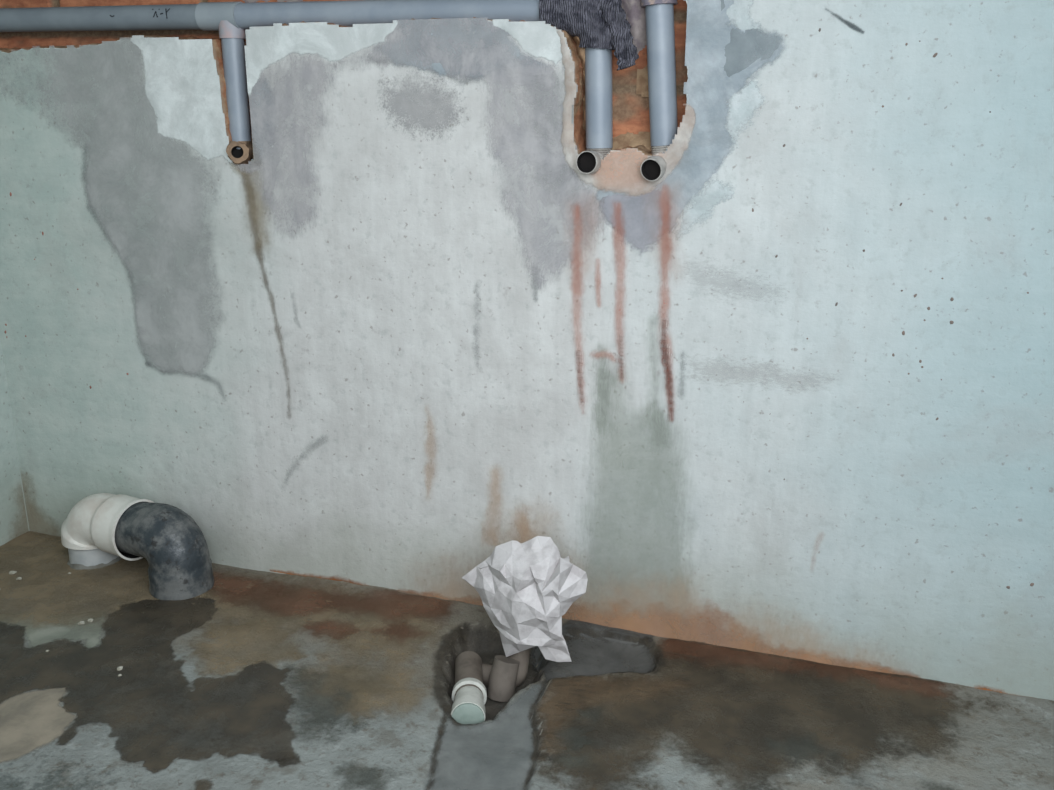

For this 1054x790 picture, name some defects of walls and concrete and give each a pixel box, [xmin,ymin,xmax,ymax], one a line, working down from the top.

flaking render [0,0,345,8]
flaking render [0,30,232,143]
flaking render [237,56,328,227]
flaking render [361,0,673,285]
flaking render [674,0,688,127]
corrosion [661,338,673,420]
damp [0,598,367,773]
corrosion [212,571,483,638]
corrosion [562,606,944,695]
damp [195,780,212,790]